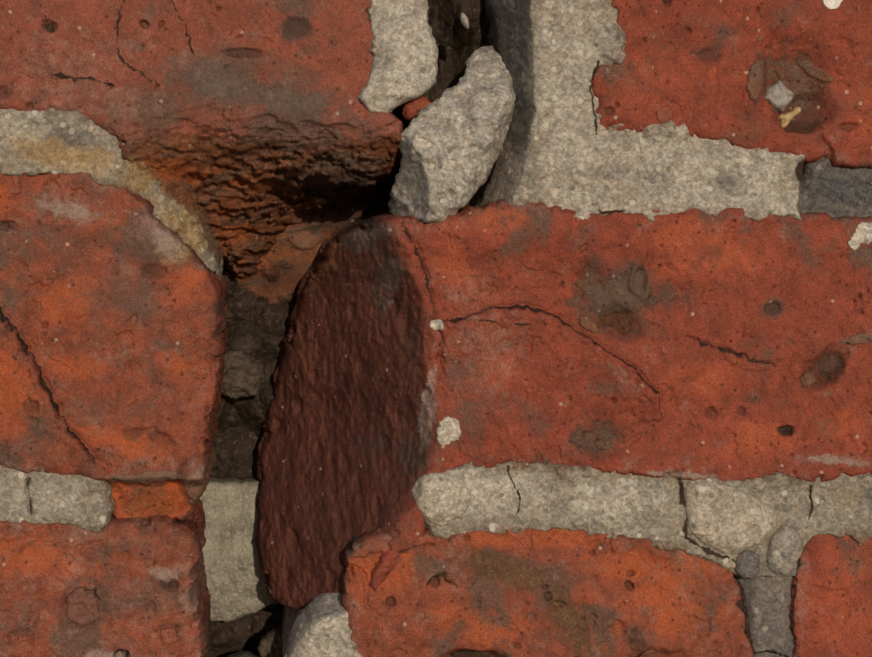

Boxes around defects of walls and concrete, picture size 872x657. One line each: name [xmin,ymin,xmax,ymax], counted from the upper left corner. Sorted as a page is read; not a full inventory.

crack [423,0,490,102]
crack [394,108,411,131]
peeling [402,96,432,120]
crack [589,60,600,135]
crack [356,153,664,419]
crack [0,307,95,460]
crack [210,262,298,480]
crack [507,465,521,517]
crack [427,573,457,588]
crack [676,471,813,657]
crack [209,603,284,657]